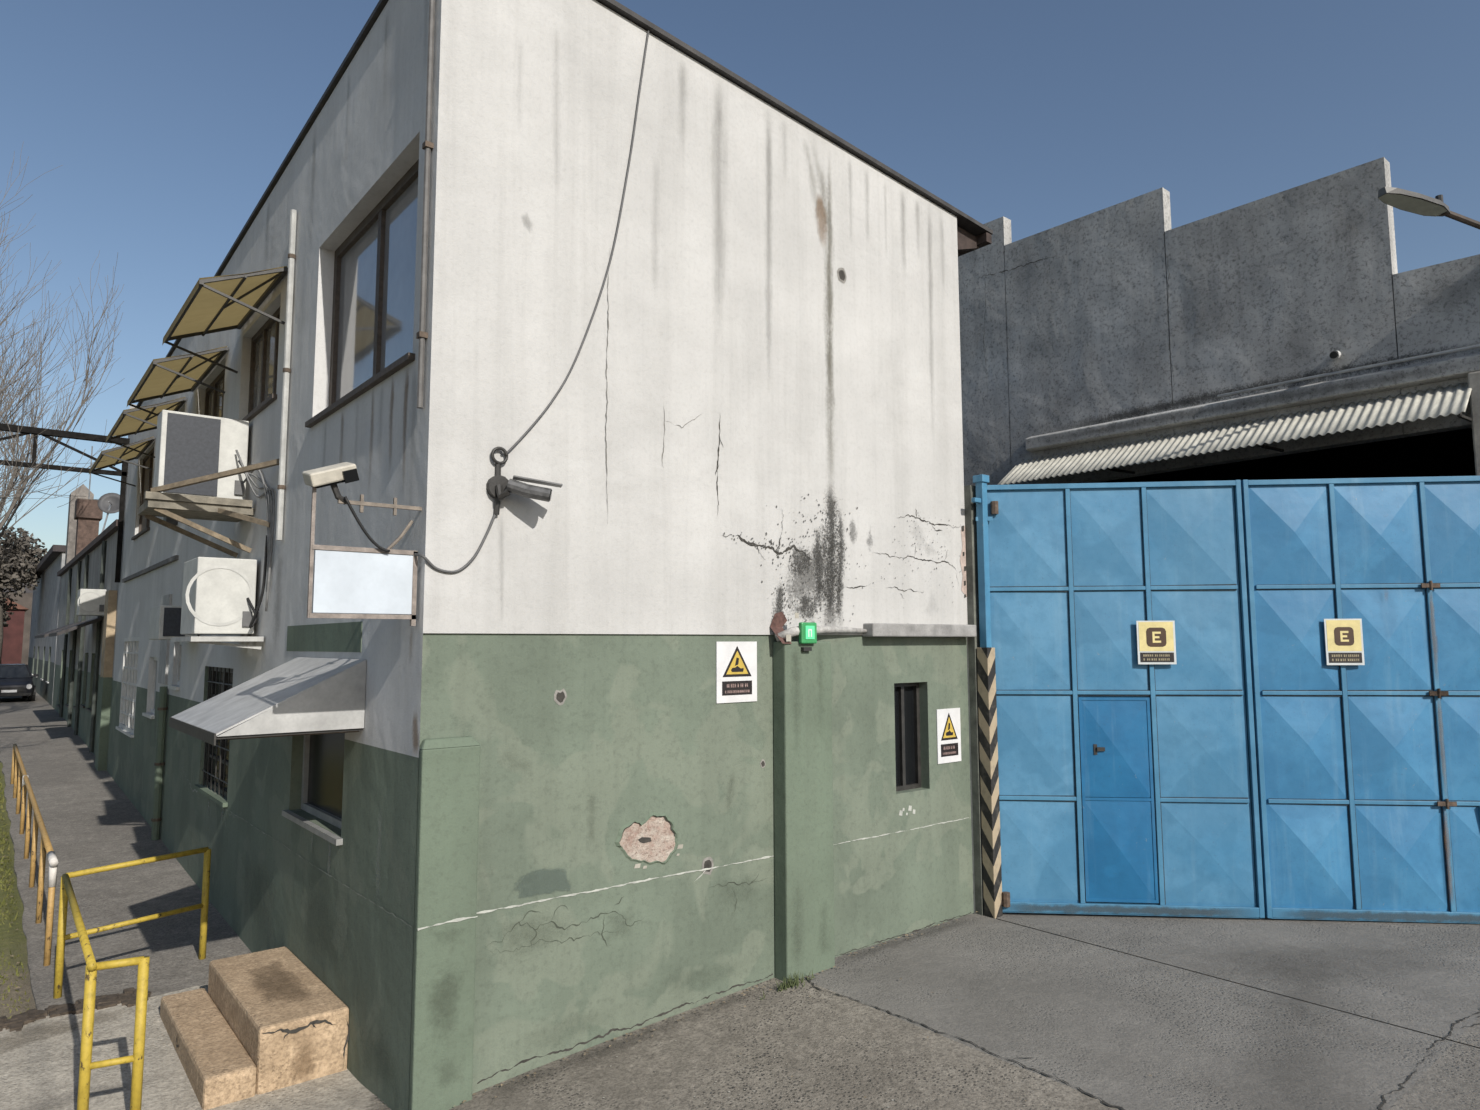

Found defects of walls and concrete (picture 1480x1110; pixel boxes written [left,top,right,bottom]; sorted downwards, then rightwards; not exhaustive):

water stain [724,494,860,624]
crack [848,510,961,599]
spalling [615,812,683,869]
crack [262,1020,350,1065]
crack [477,912,1125,1110]
crack [1378,1008,1480,1110]